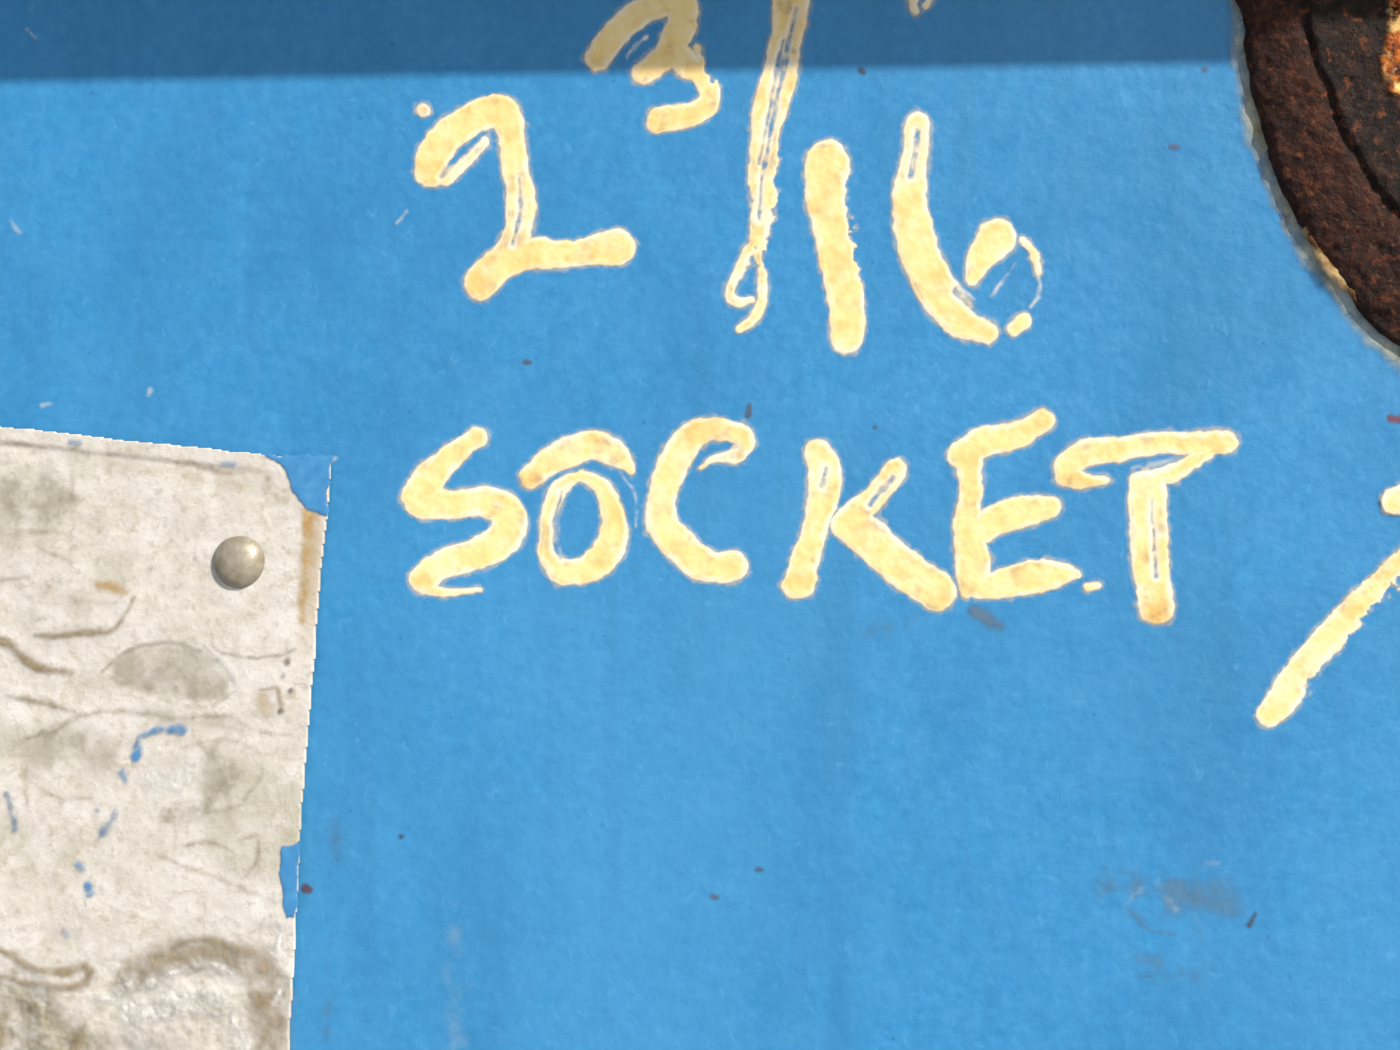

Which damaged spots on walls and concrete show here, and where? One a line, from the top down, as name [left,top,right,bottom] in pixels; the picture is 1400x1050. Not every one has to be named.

rust [1383,0,1400,94]
rust [1319,251,1356,293]